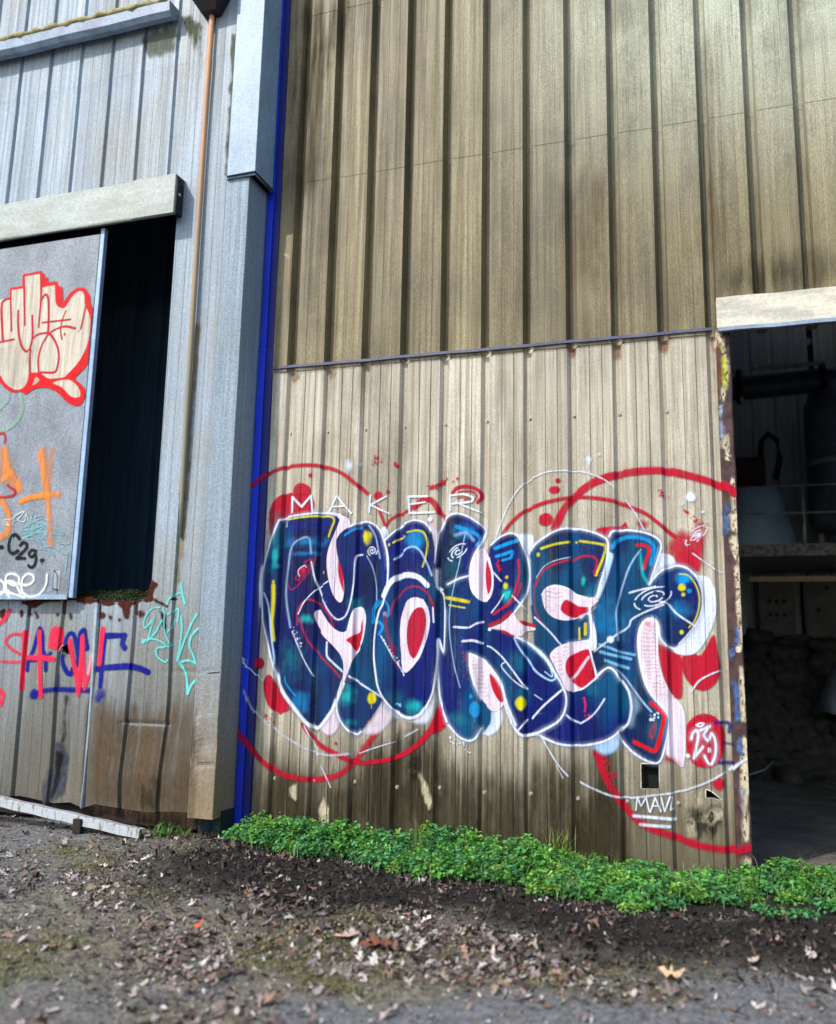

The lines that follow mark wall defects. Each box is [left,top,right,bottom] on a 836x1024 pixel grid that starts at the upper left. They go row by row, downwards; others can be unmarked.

corrosion [20,581,177,621]
water stain [42,736,69,804]